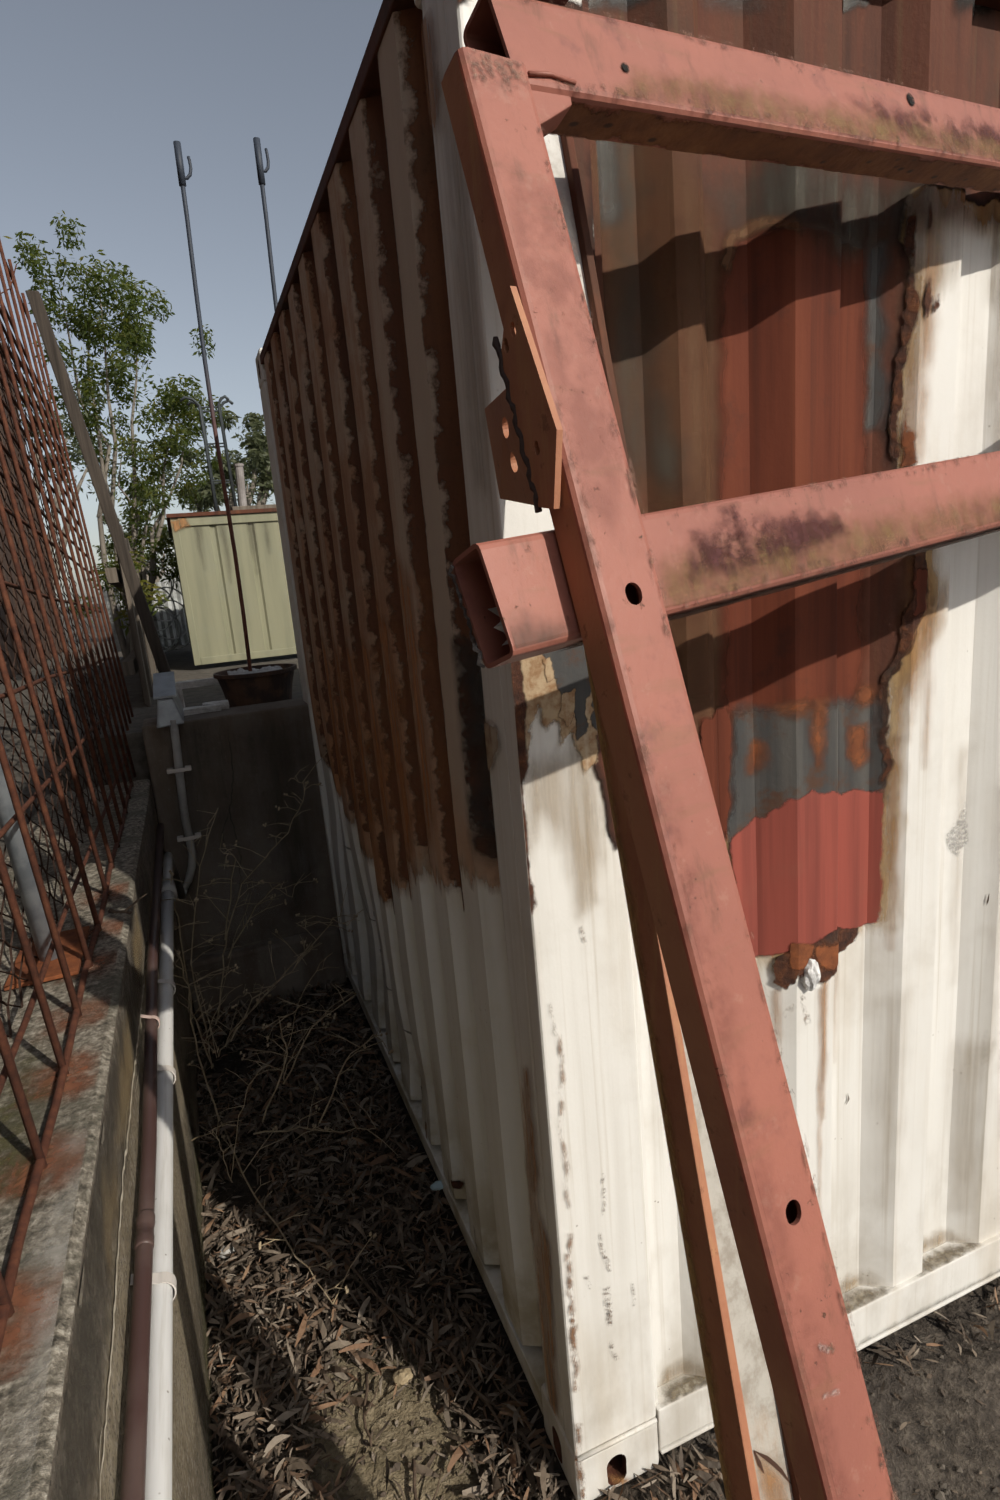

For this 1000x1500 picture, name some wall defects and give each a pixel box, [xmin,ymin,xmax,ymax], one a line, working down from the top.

corrosion [536,0,1000,109]
corrosion [549,101,1000,514]
peeling [889,207,940,460]
corrosion [264,7,500,914]
peeling [520,645,598,772]
corrosion [593,724,618,850]
corrosion [668,528,1000,843]
peeling [879,551,928,783]
peeling [789,938,839,970]
corrosion [522,1071,579,1416]